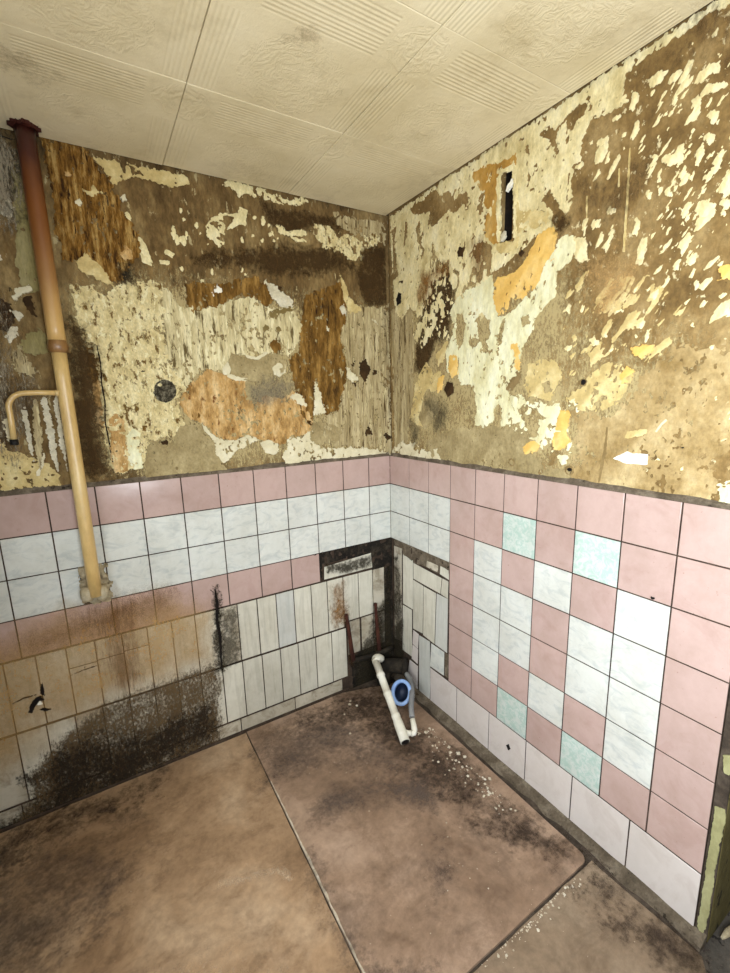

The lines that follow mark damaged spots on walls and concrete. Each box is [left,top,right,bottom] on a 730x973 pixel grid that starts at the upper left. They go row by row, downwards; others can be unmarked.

peeling [0,162,48,378]
peeling [69,0,730,503]
flaking render [0,440,61,491]
leakage [213,584,240,673]
rust [332,582,345,623]
peeling [315,538,450,687]
leakage [0,801,128,872]